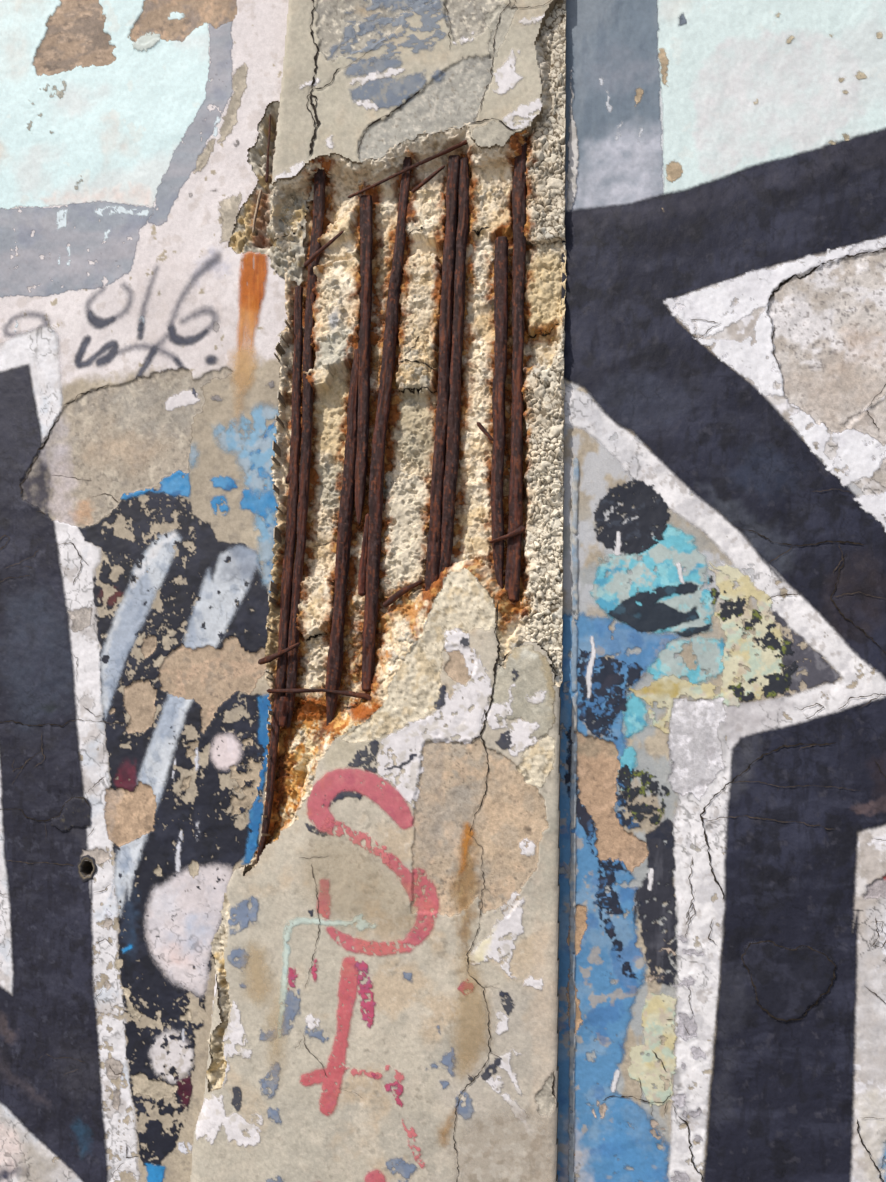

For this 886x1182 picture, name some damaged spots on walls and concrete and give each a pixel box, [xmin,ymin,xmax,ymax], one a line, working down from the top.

peeling [33,0,116,99]
crack [306,0,386,156]
crack [358,89,421,154]
crack [470,0,550,130]
spalling [109,0,567,868]
rust [255,128,556,854]
peeling [767,249,886,487]
peeling [81,781,157,864]
crack [453,600,510,1182]
peeling [411,734,556,917]
peeling [574,730,649,872]
crack [685,693,886,942]